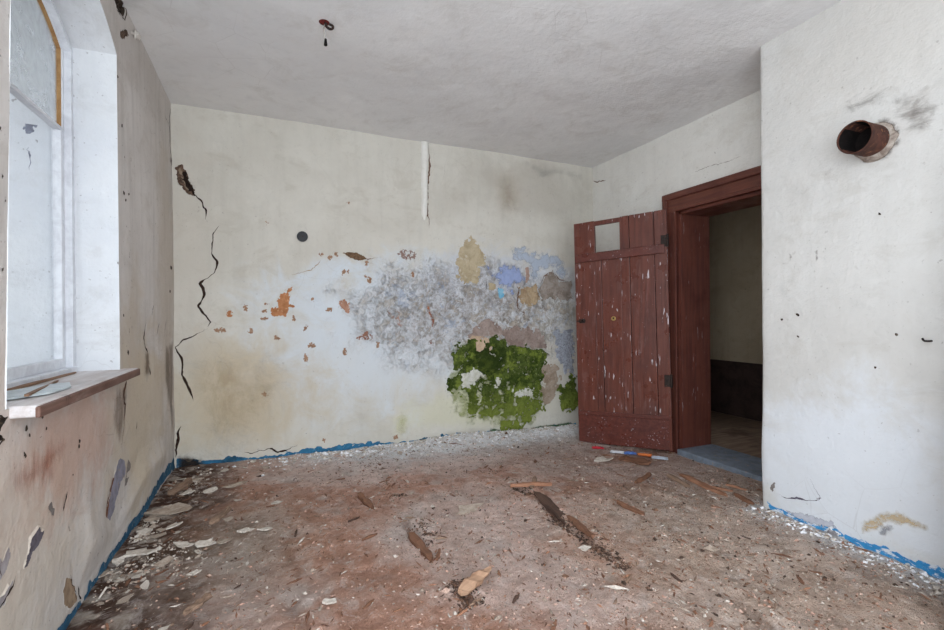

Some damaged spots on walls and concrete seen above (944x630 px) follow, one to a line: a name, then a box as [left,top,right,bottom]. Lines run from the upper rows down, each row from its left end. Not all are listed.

spalling [319,251,373,283]
spalling [455,235,496,290]
crack [122,196,219,440]
spalling [260,286,308,331]
spalling [325,298,351,314]
spalling [467,267,576,406]
crack [174,427,182,457]
peeling [106,458,131,520]
peeling [0,546,11,580]
peeling [23,525,45,569]
spalling [63,577,77,611]